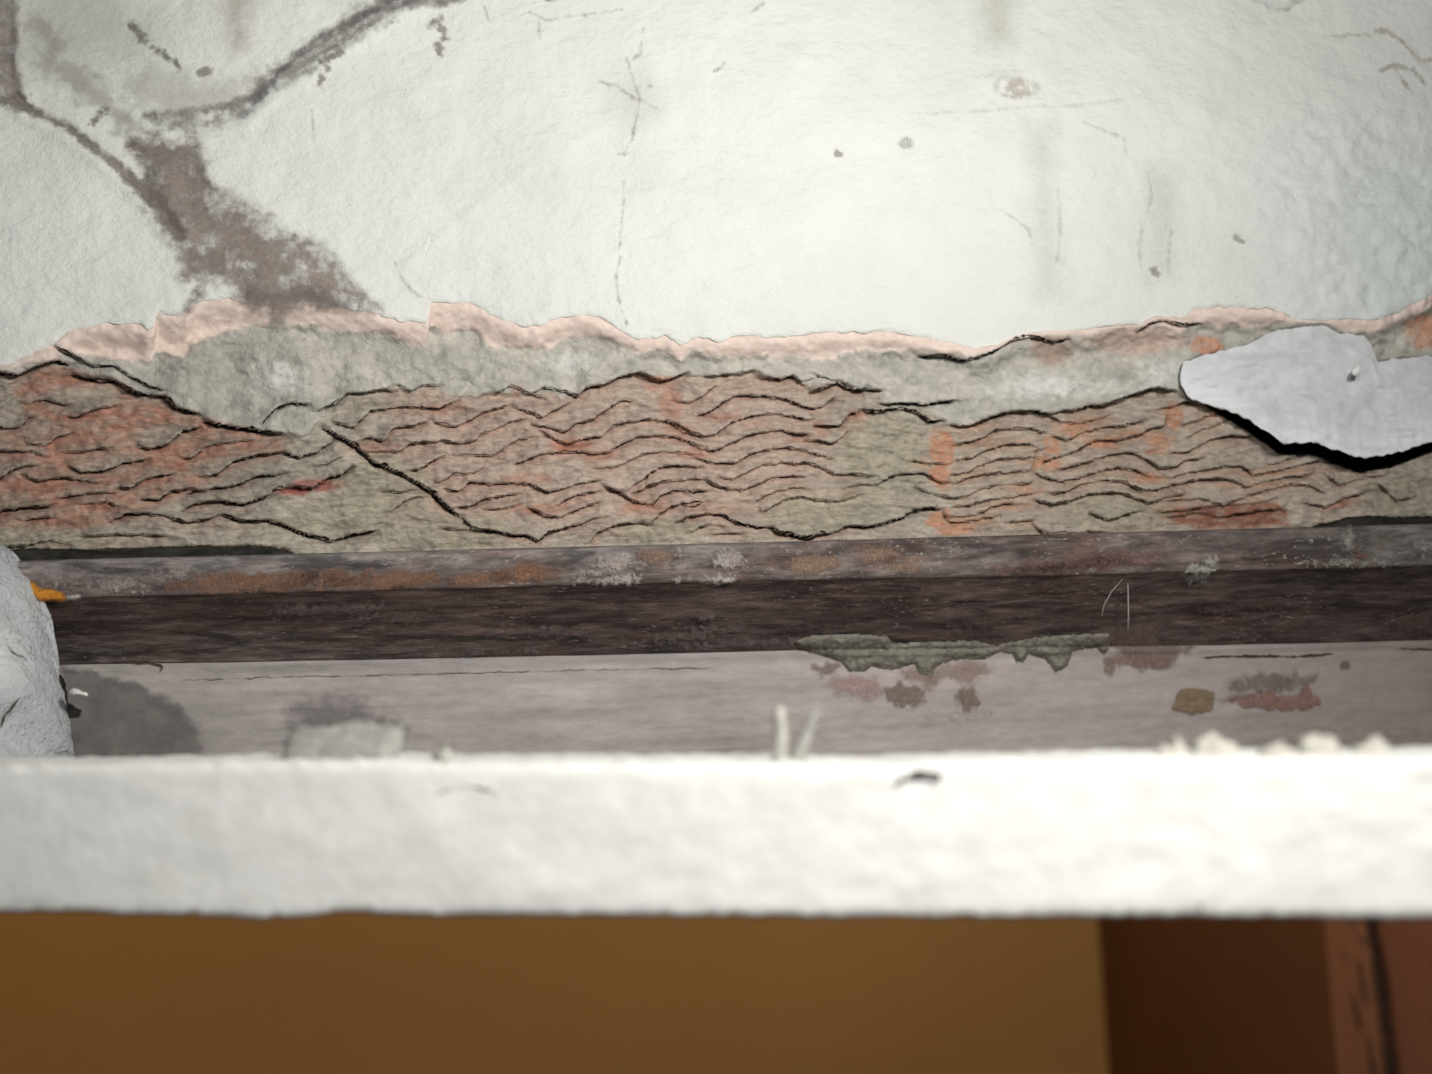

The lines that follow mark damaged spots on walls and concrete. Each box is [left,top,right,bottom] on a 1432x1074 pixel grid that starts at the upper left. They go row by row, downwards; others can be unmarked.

spalling [0,293,1432,554]
leakage [1105,655,1170,674]